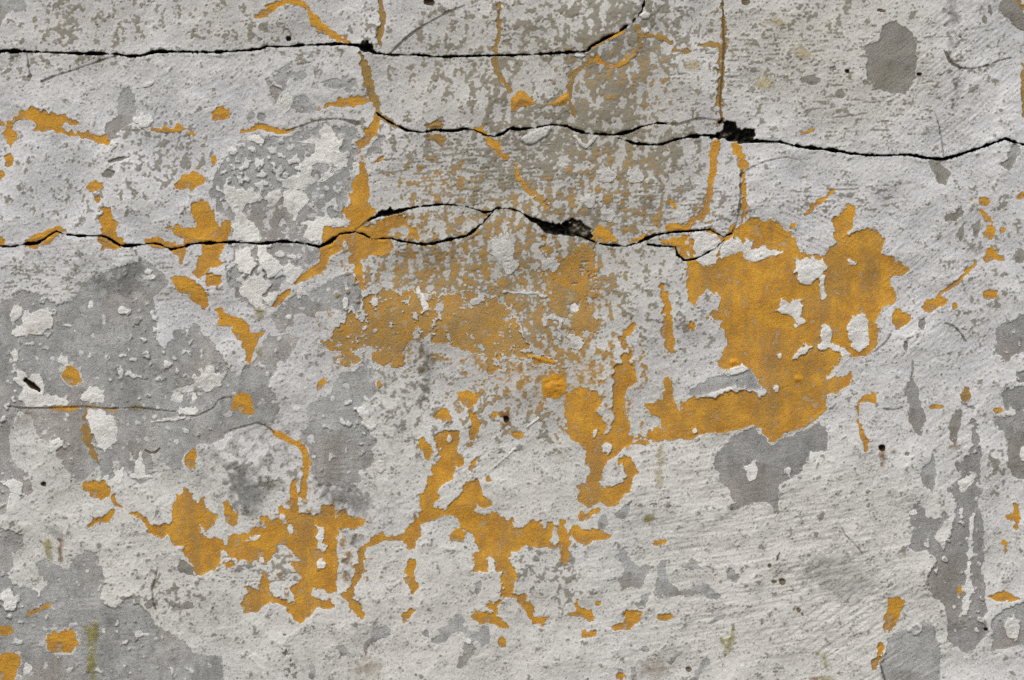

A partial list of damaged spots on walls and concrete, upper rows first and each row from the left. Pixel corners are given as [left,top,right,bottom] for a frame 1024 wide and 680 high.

crack [0,0,645,82]
crack [293,0,725,146]
flaking render [860,20,918,95]
crack [0,121,1024,261]
flaking render [0,0,558,624]
peeling [340,119,912,669]
flaking render [871,341,1024,680]
flaking render [282,650,316,679]
flaking render [616,667,637,680]
flaking render [690,656,711,680]